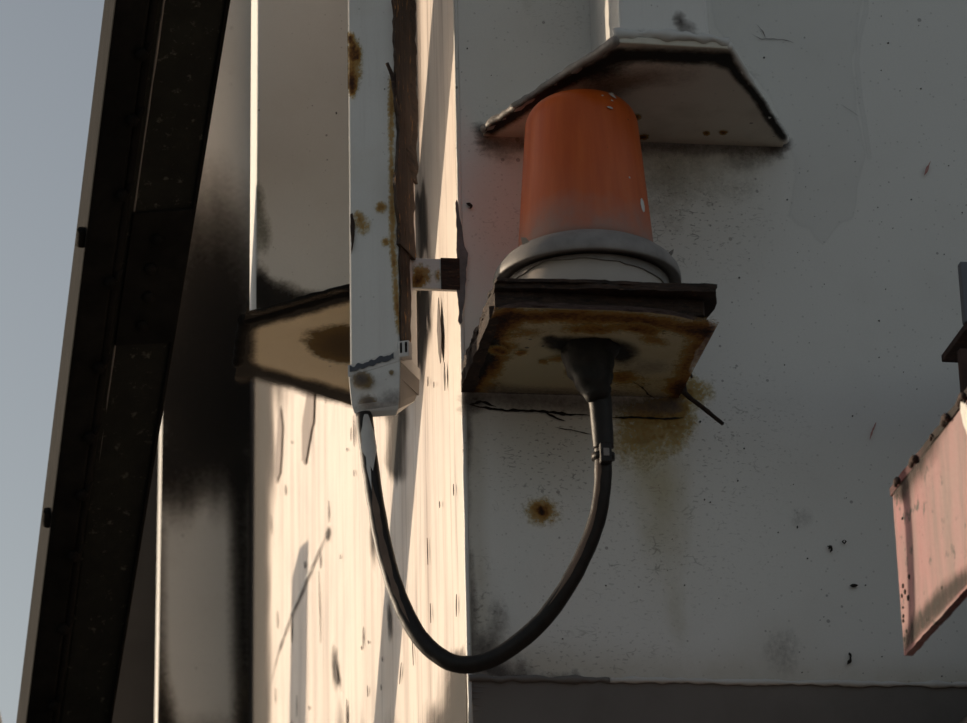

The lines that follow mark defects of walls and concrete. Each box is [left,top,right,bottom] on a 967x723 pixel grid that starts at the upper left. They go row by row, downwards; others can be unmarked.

rust [347,32,362,98]
rust [376,78,399,332]
rust [412,266,439,287]
rust [461,277,719,461]
crack [469,382,684,434]
rust [526,499,558,523]